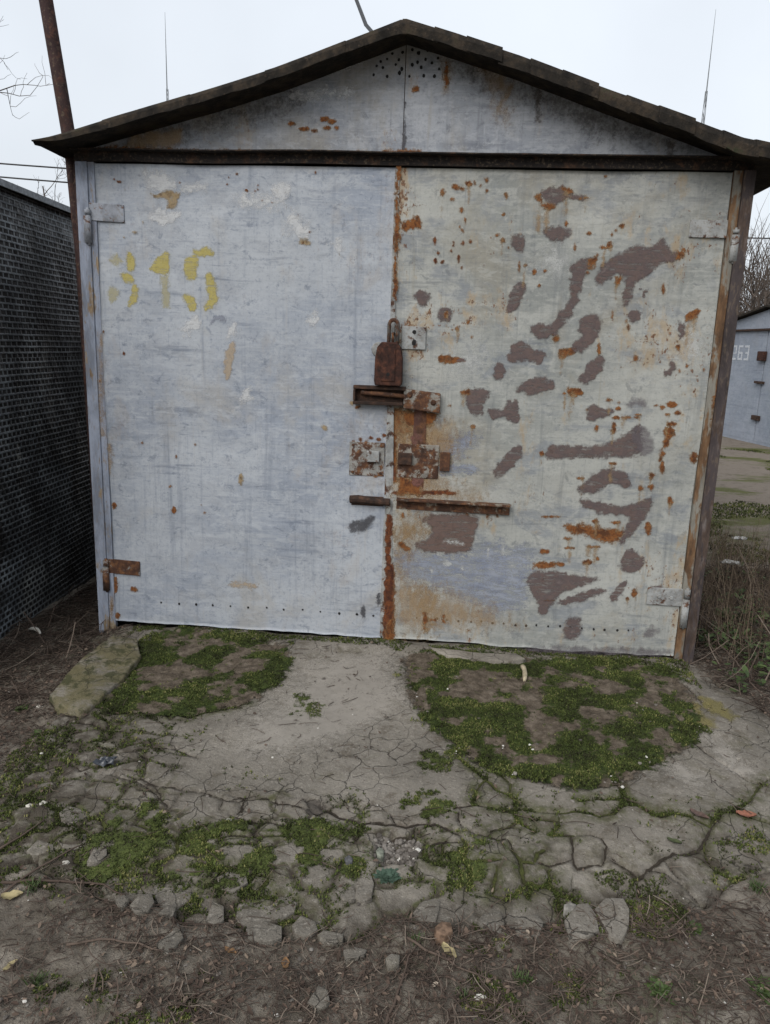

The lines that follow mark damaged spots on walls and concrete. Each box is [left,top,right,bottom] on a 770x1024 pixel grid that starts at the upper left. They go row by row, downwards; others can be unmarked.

rust [288,116,339,133]
rust [685,308,701,322]
rust [352,408,482,501]
rust [532,515,624,569]
rust [382,513,491,640]
crack [4,702,768,909]
crack [204,866,295,925]